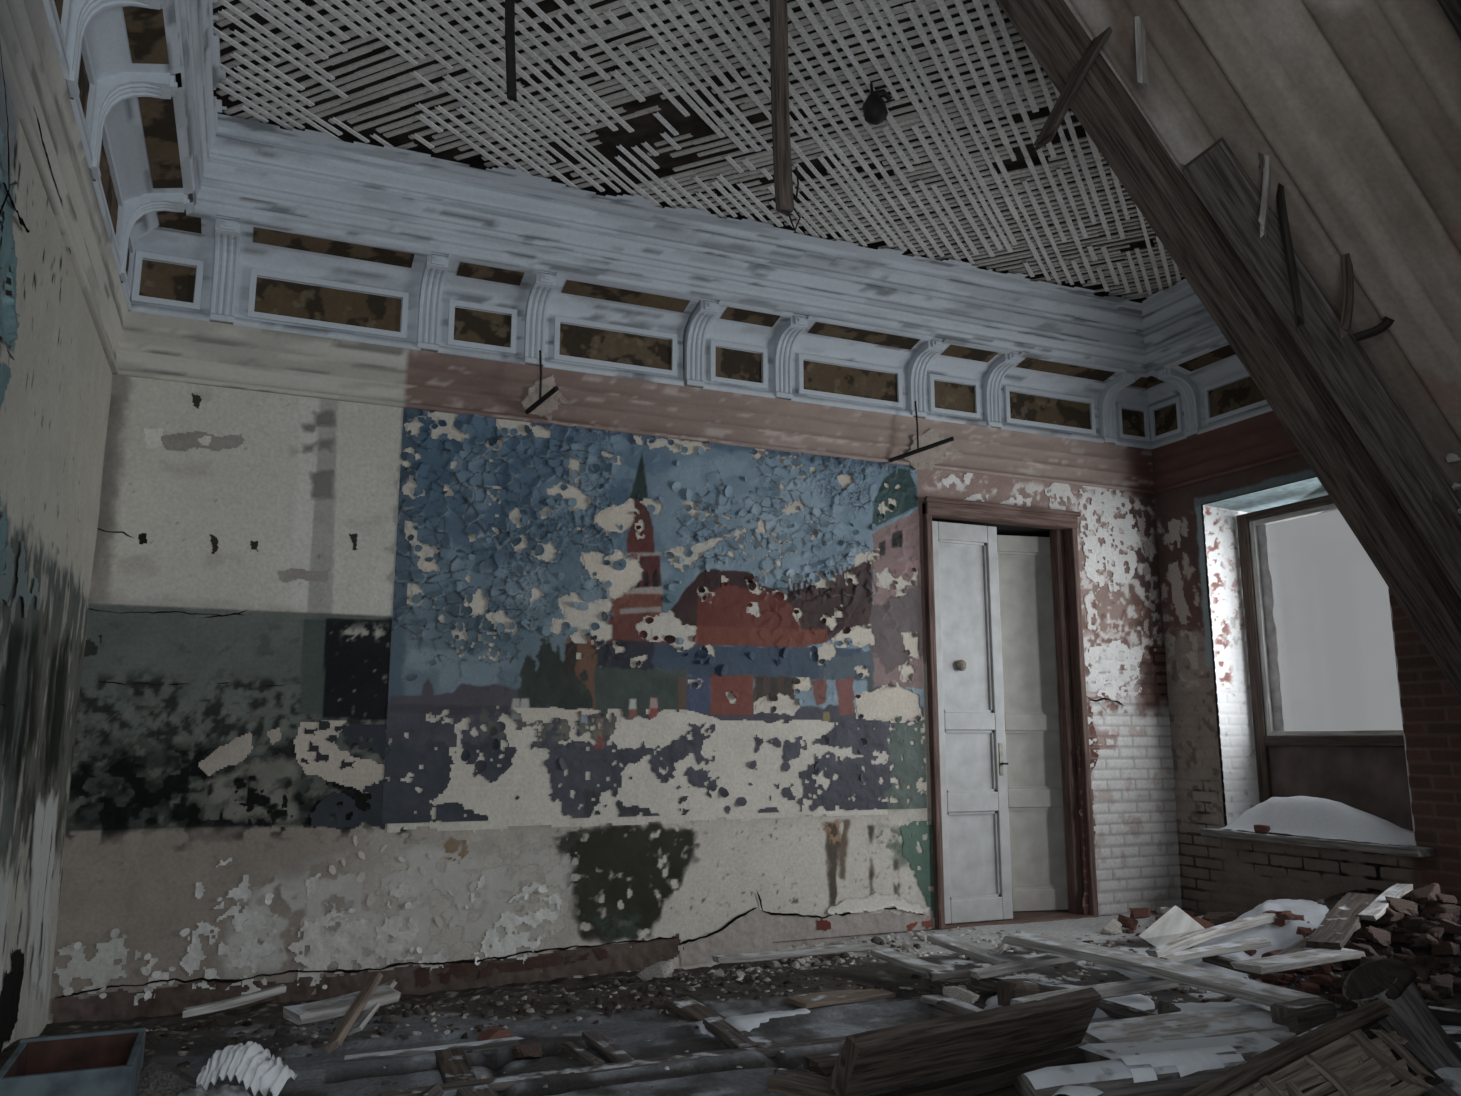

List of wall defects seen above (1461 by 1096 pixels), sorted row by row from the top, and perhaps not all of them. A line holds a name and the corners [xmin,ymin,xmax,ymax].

peeling [0,128,20,410]
peeling [144,428,245,452]
peeling [400,410,467,497]
flaking render [488,375,567,450]
peeling [0,492,40,618]
flaking render [210,534,219,554]
peeling [278,568,330,583]
peeling [405,521,442,626]
peeling [449,434,918,690]
peeling [904,428,1198,915]
peeling [51,606,935,1023]